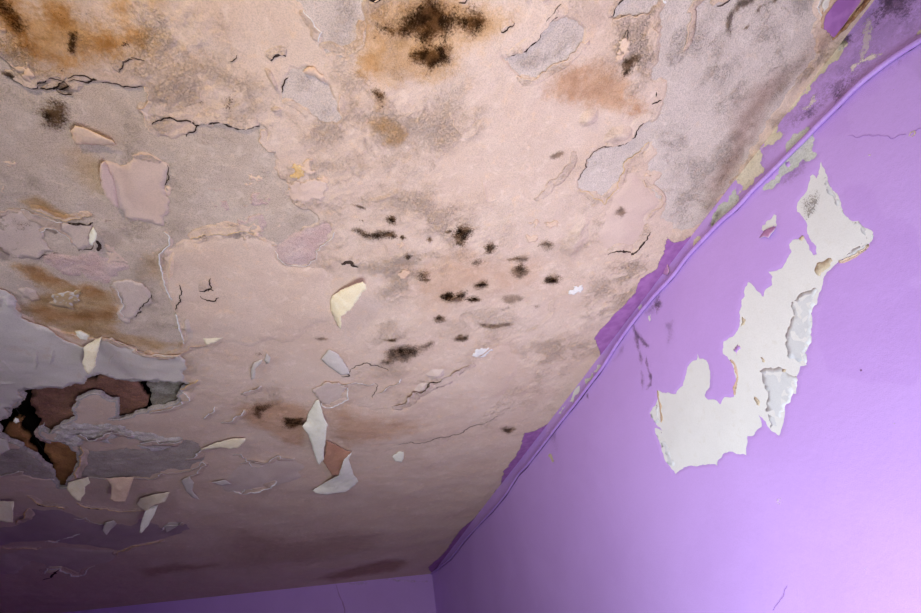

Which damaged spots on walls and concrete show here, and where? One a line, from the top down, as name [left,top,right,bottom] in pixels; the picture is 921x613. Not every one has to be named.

leakage [377,0,485,72]
peeling [504,4,590,86]
leakage [41,101,69,128]
peeling [0,58,367,479]
leakage [355,216,404,240]
leakage [446,224,472,246]
leakage [441,292,479,302]
peeling [578,0,874,474]
leakage [382,339,431,364]
peeling [302,285,583,495]
peeling [53,422,305,502]
peeling [0,492,189,552]